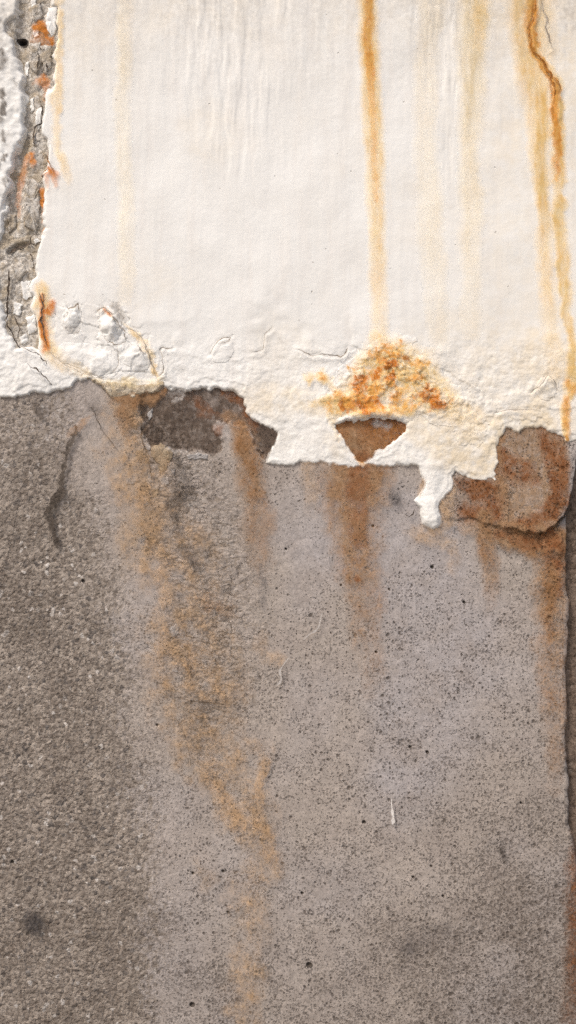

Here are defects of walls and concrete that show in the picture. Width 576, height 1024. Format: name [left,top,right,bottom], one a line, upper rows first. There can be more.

rust [361,0,381,185]
crack [528,0,561,103]
flaking render [0,0,58,349]
rust [516,0,576,441]
rust [36,287,55,351]
rust [113,389,234,706]
spalling [87,378,278,508]
rust [226,419,265,540]
rust [326,428,387,589]
peeling [336,418,406,451]
rust [307,339,453,417]
spalling [459,427,569,530]